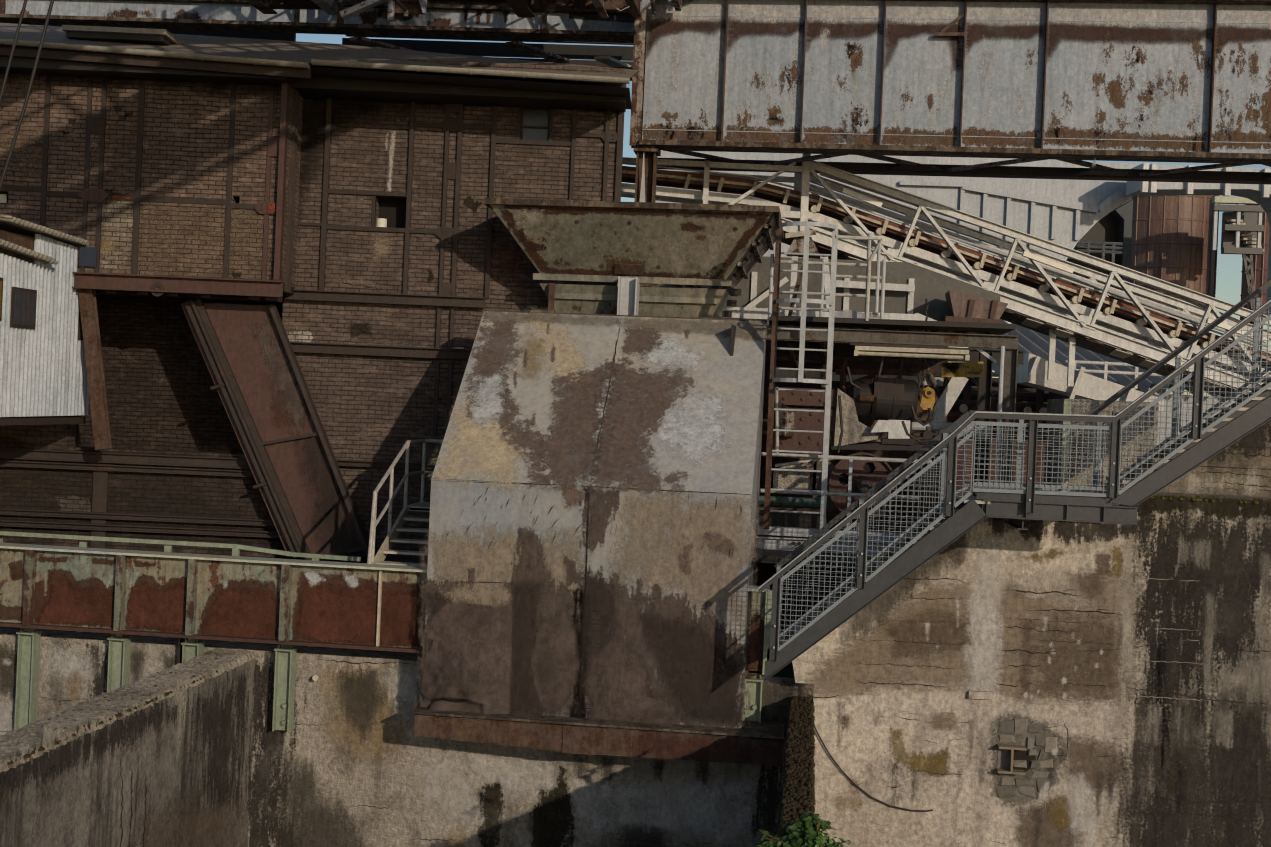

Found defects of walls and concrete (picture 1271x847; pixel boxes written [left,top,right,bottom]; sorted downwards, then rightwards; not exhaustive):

corrosion [111,7,152,24]
corrosion [642,18,1271,152]
corrosion [500,205,769,280]
damp [50,643,108,698]
damp [0,648,361,847]
damp [509,583,542,715]
damp [428,755,785,847]
damp [642,614,741,724]
peeling [990,573,1211,807]
damp [988,504,1271,847]